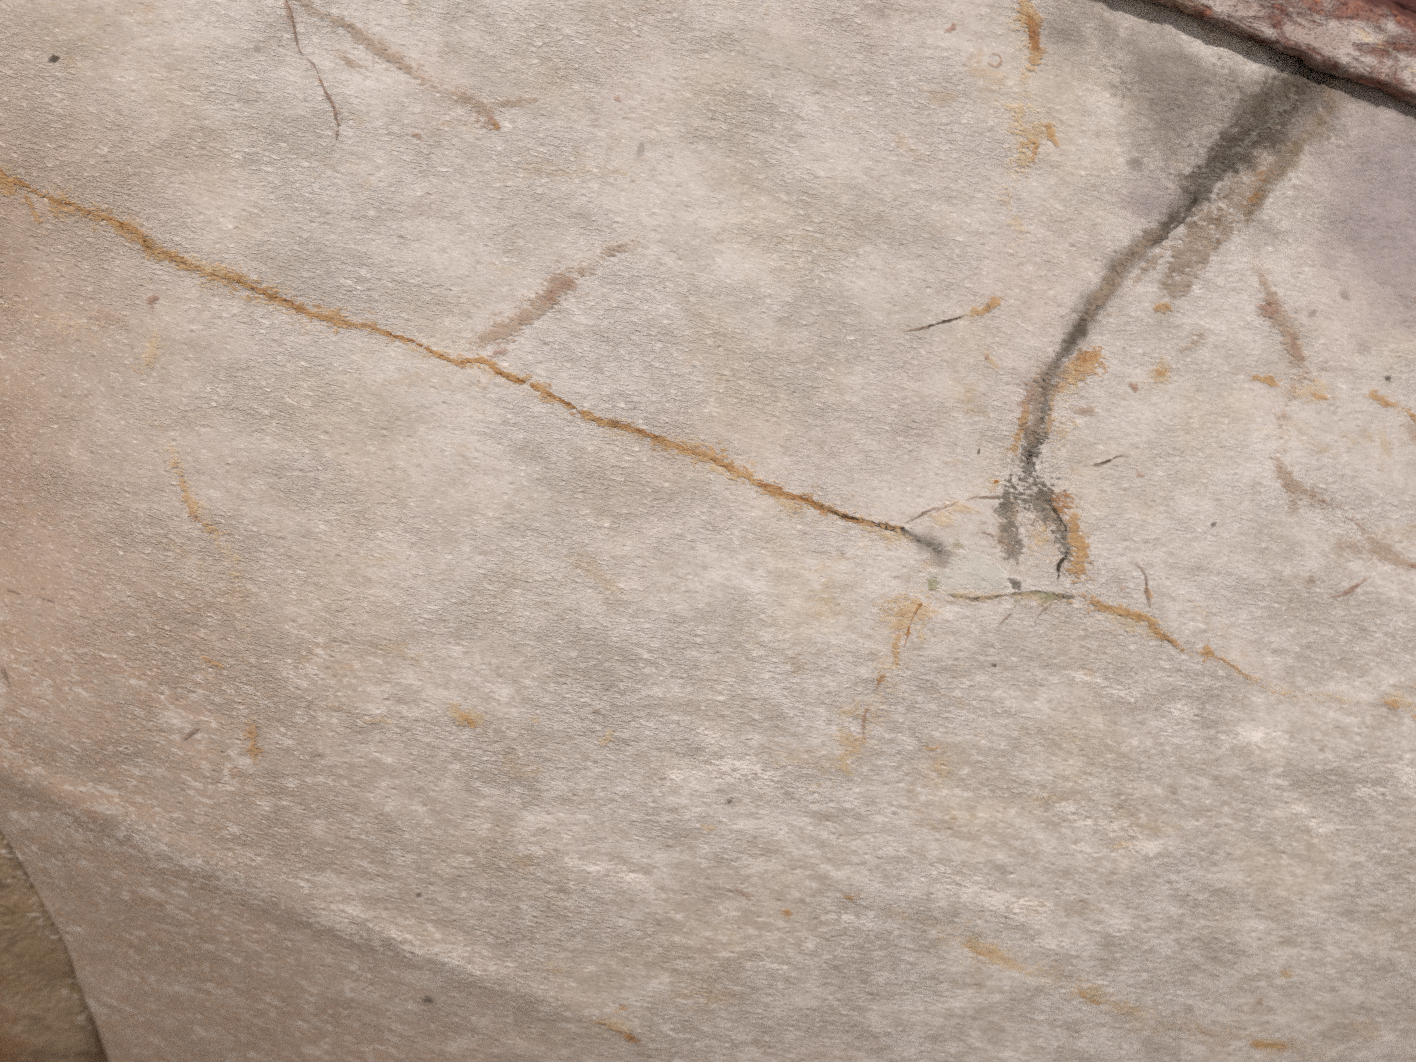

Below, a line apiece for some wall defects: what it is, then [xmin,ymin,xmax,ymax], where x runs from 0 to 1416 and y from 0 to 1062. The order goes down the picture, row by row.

corrosion [1014,0,1047,71]
corrosion [1017,121,1059,172]
water stain [1128,40,1416,326]
water stain [1259,273,1307,365]
crack [0,92,1306,693]
water stain [1276,465,1320,508]